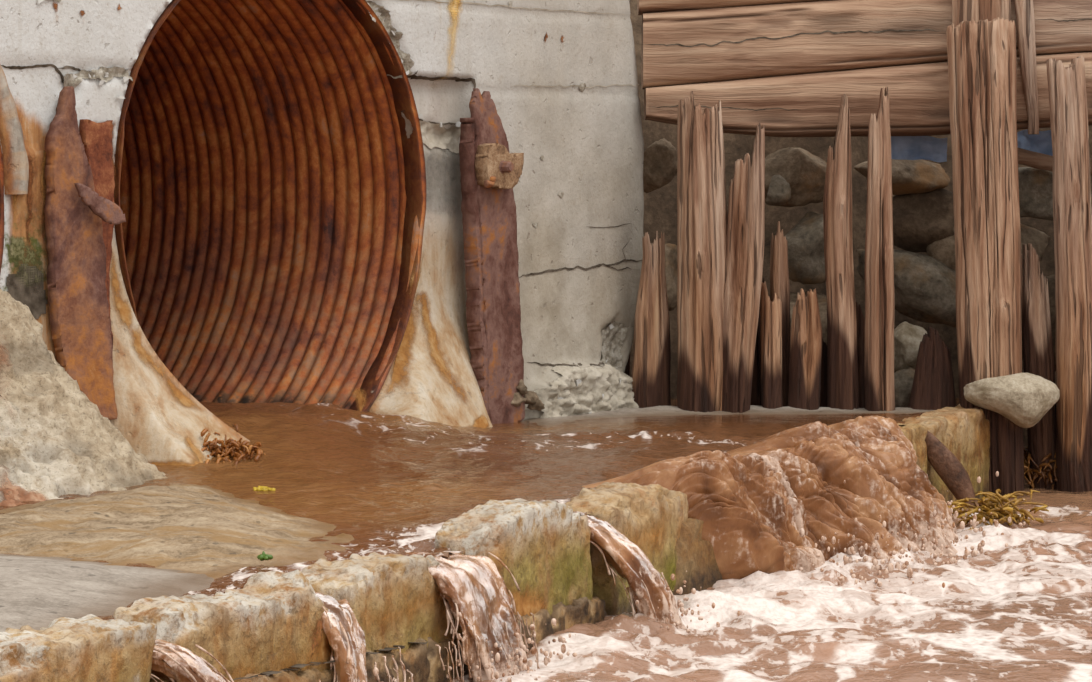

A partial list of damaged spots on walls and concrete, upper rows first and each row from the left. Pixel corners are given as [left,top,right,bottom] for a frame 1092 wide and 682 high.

spalling [365,0,414,76]
rust [449,0,460,61]
crack [519,223,642,278]
rust [111,255,195,407]
rust [387,270,467,401]